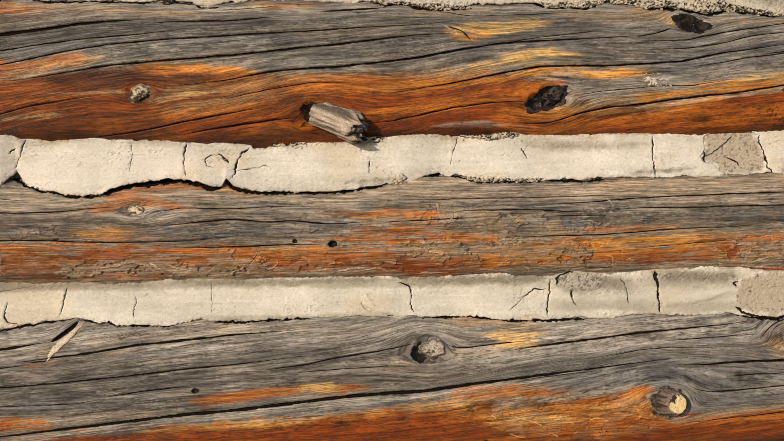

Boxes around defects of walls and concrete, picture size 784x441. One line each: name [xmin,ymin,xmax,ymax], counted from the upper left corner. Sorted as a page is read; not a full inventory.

crack [0,7,784,175]
crack [205,148,267,180]
spalling [701,131,766,175]
crack [0,191,784,248]
spalling [734,271,784,316]
crack [0,271,784,438]